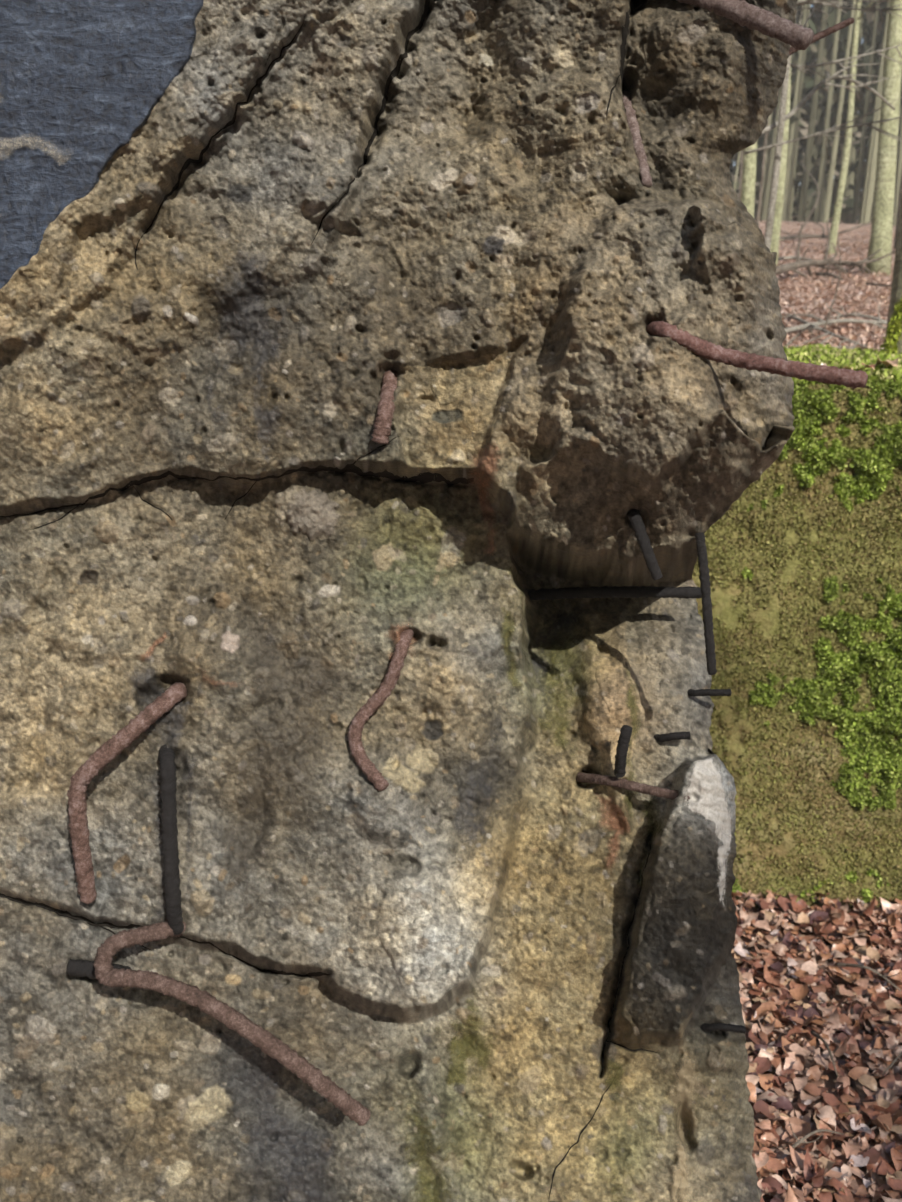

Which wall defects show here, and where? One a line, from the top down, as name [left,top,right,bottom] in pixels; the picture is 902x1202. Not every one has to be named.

crack [135,17,305,270]
crack [311,0,430,244]
spalling [623,90,653,188]
spalling [641,0,855,155]
crack [0,436,474,531]
spalling [528,509,731,820]
crack [0,893,153,951]
crack [180,936,330,977]
crack [549,844,657,1202]